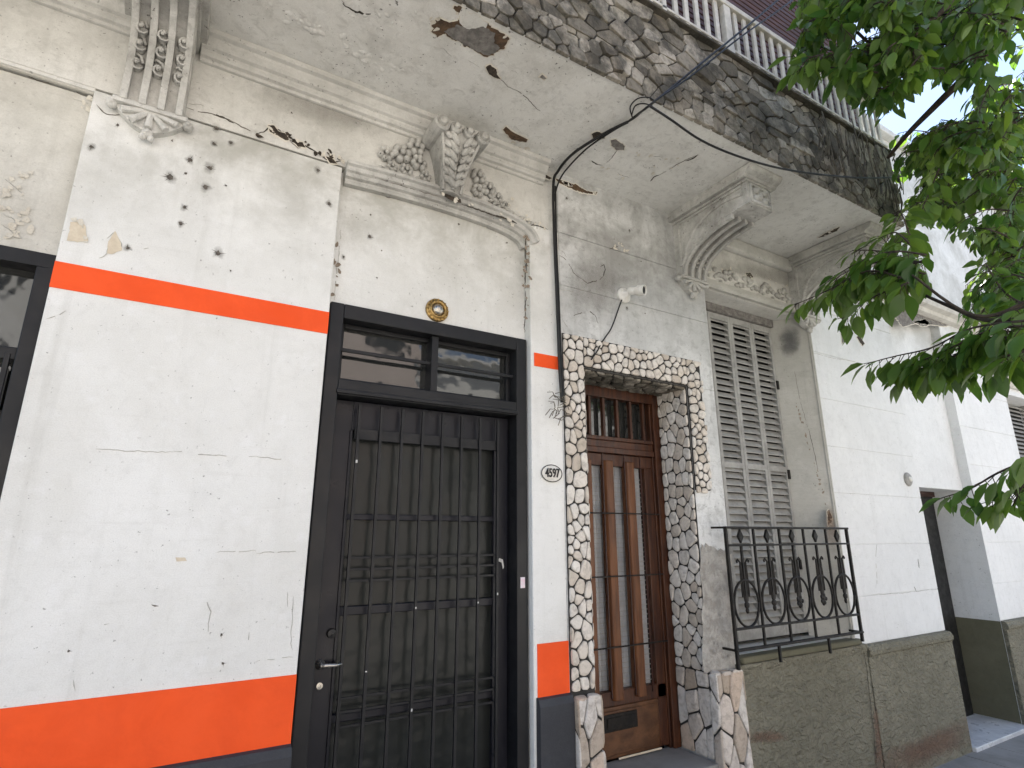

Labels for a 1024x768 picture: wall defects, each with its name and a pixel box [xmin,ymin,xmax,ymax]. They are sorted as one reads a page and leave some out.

spalling [429,4,538,110]
crack [186,104,251,131]
spalling [255,124,345,165]
spalling [502,125,530,150]
spalling [591,130,697,181]
spalling [545,174,598,196]
peeling [67,218,88,243]
peeling [100,232,122,258]
crack [102,449,280,460]